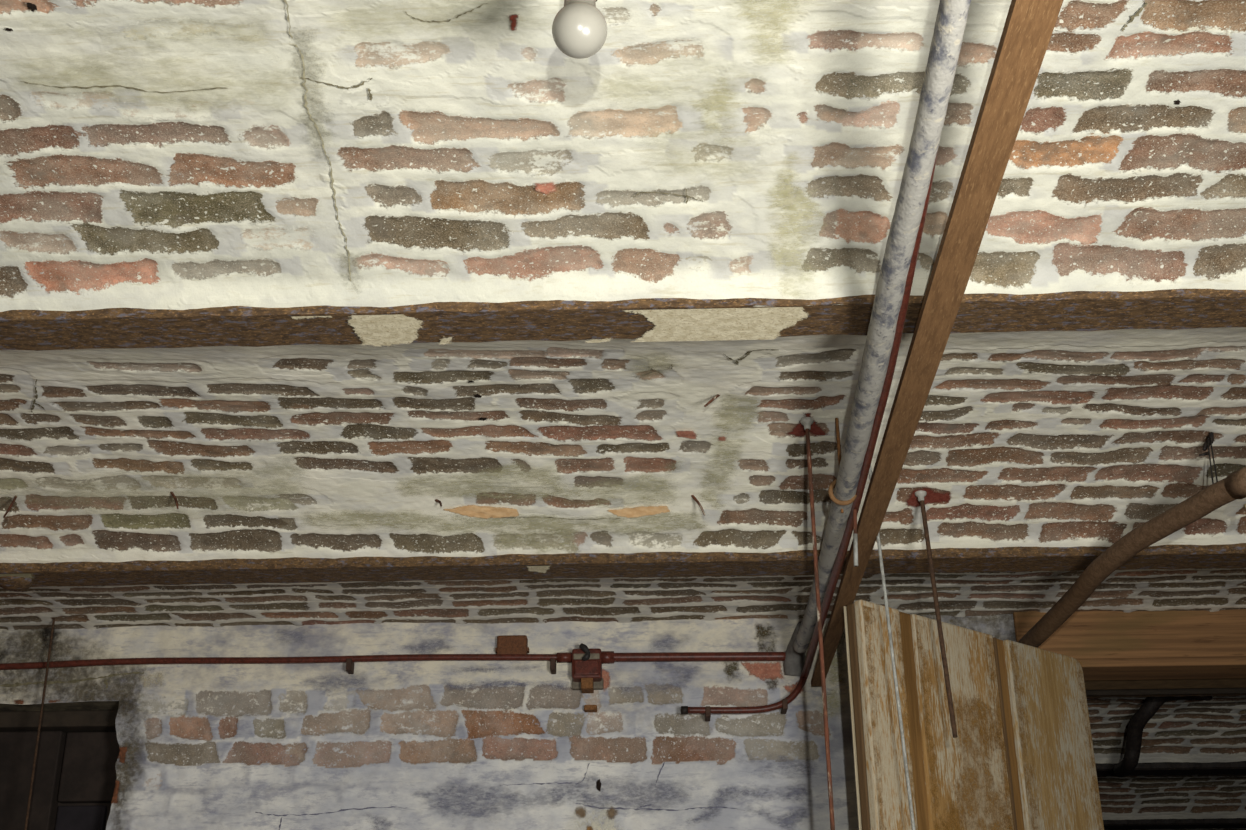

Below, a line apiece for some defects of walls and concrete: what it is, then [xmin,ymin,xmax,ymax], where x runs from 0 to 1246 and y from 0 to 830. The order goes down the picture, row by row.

crack [283,0,373,281]
damp [115,705,143,830]